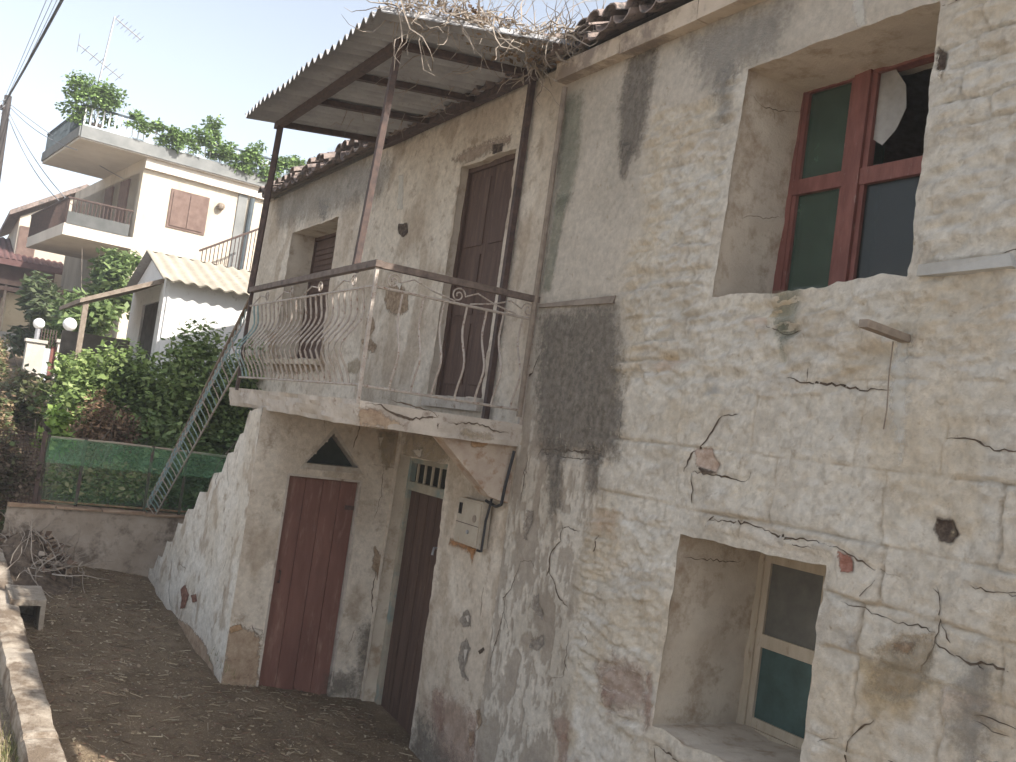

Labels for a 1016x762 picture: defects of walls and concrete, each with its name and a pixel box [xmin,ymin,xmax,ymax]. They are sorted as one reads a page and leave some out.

crack [369,400,508,433]
water stain [536,305,624,514]
crack [685,414,751,502]
crack [947,437,1016,452]
peeling [177,585,263,687]
peeling [460,610,471,627]
peeling [458,639,484,681]
crack [480,526,599,670]
crack [709,516,1008,672]